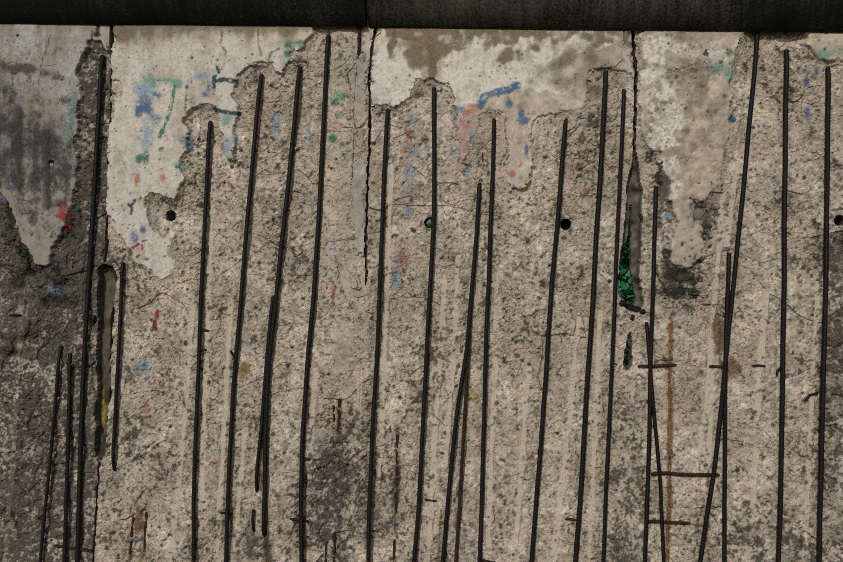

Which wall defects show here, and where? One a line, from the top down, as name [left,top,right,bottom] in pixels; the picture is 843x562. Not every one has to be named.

leakage [0,61,81,224]
crack [342,30,382,178]
spalling [0,24,390,562]
crack [352,228,373,301]
spalling [369,30,843,562]